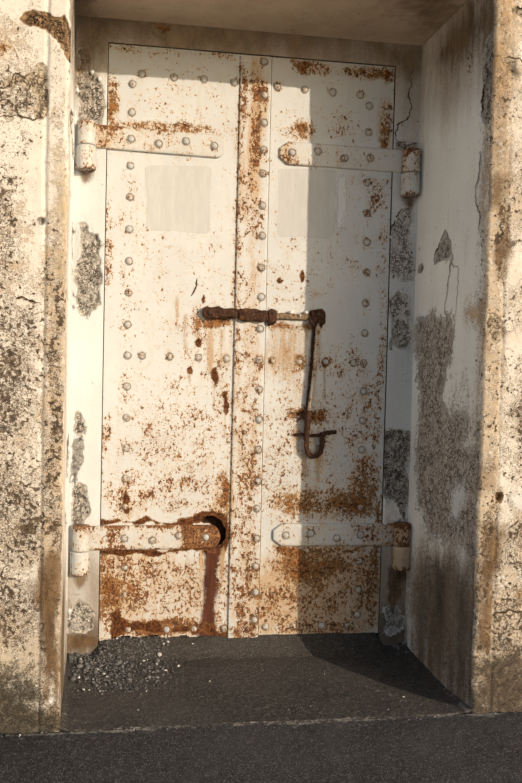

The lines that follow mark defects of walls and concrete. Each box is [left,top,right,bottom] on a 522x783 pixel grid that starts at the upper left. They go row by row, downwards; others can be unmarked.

spalling [4,62,49,120]
rust [290,58,312,76]
crack [395,70,416,146]
spalling [72,222,105,318]
rust [210,367,230,415]
rust [287,405,330,426]
peeling [383,207,481,563]
spalling [65,410,91,529]
rust [275,475,382,523]
rust [99,473,231,640]
rust [272,545,406,612]
spalling [382,603,405,637]